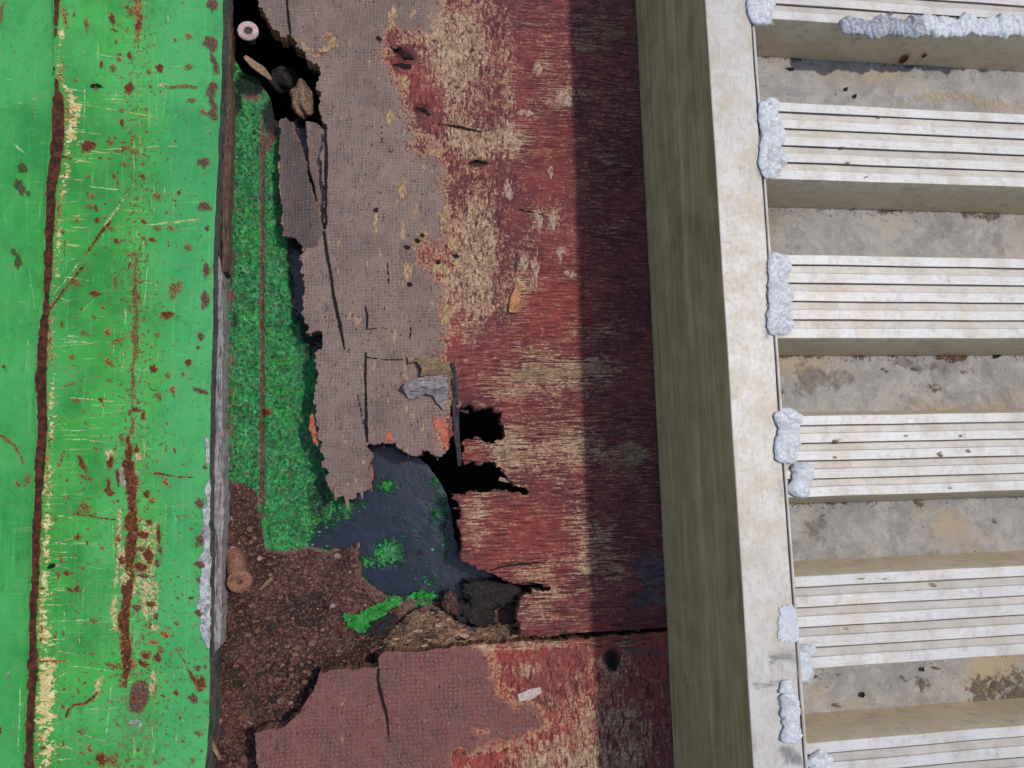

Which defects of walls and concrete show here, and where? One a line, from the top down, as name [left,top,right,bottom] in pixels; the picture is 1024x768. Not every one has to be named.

peeling [376,4,415,91]
spalling [233,0,338,253]
peeling [555,88,584,107]
peeling [502,179,513,200]
corrosion [11,248,23,269]
peeling [520,248,540,291]
corrosion [13,0,220,768]
peeling [309,414,319,446]
spalling [402,356,527,549]
spalling [482,570,546,590]
peeling [342,589,563,660]
crack [377,668,390,742]